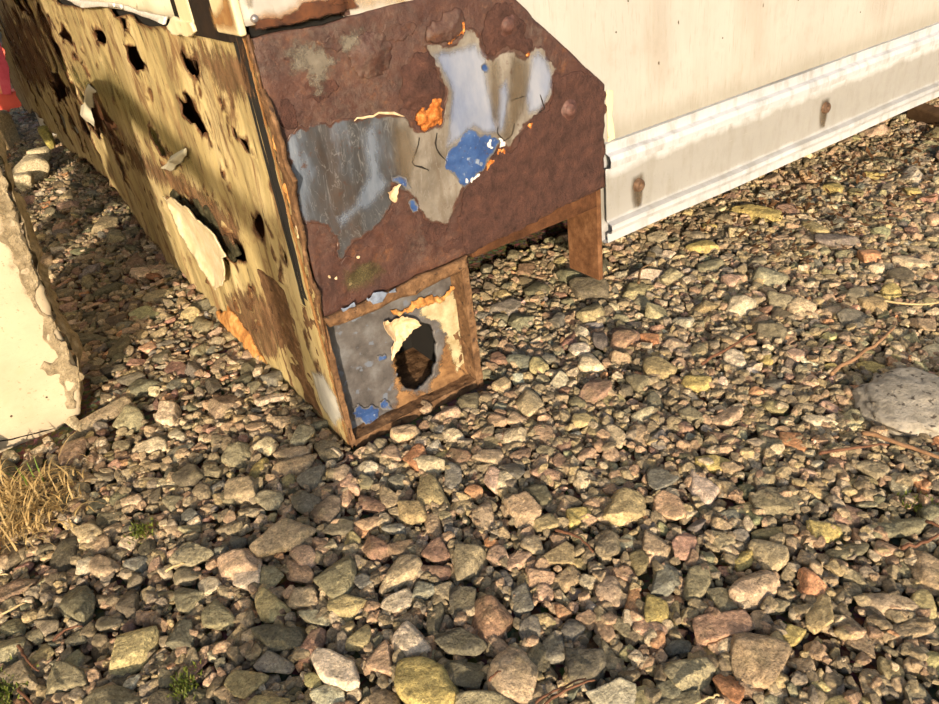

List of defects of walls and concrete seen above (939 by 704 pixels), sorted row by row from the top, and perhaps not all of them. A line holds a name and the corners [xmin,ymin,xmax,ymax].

corrosion [0,3,87,92]
corrosion [212,0,234,28]
corrosion [255,0,359,29]
corrosion [399,7,465,132]
corrosion [106,128,243,265]
corrosion [185,36,349,445]
peeling [272,27,556,261]
corrosion [457,71,607,254]